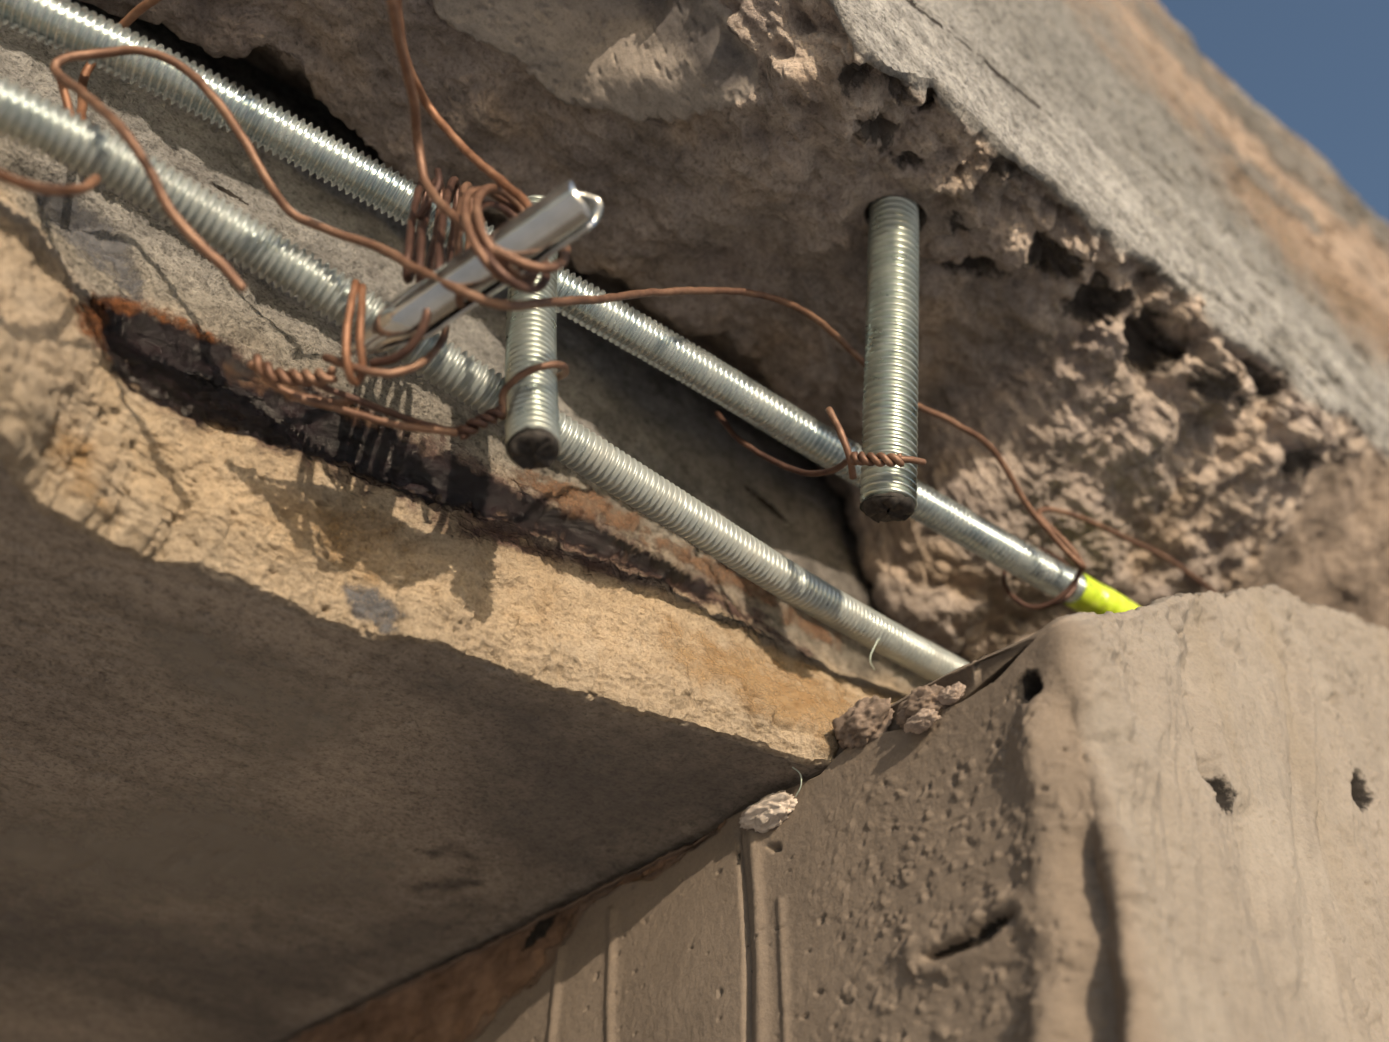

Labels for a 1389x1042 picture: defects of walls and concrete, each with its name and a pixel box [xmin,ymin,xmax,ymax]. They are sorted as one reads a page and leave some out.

spalling [0,19,447,303]
rust [65,287,851,736]
spalling [0,133,932,762]
spalling [71,0,1389,663]
crack [906,0,1052,116]